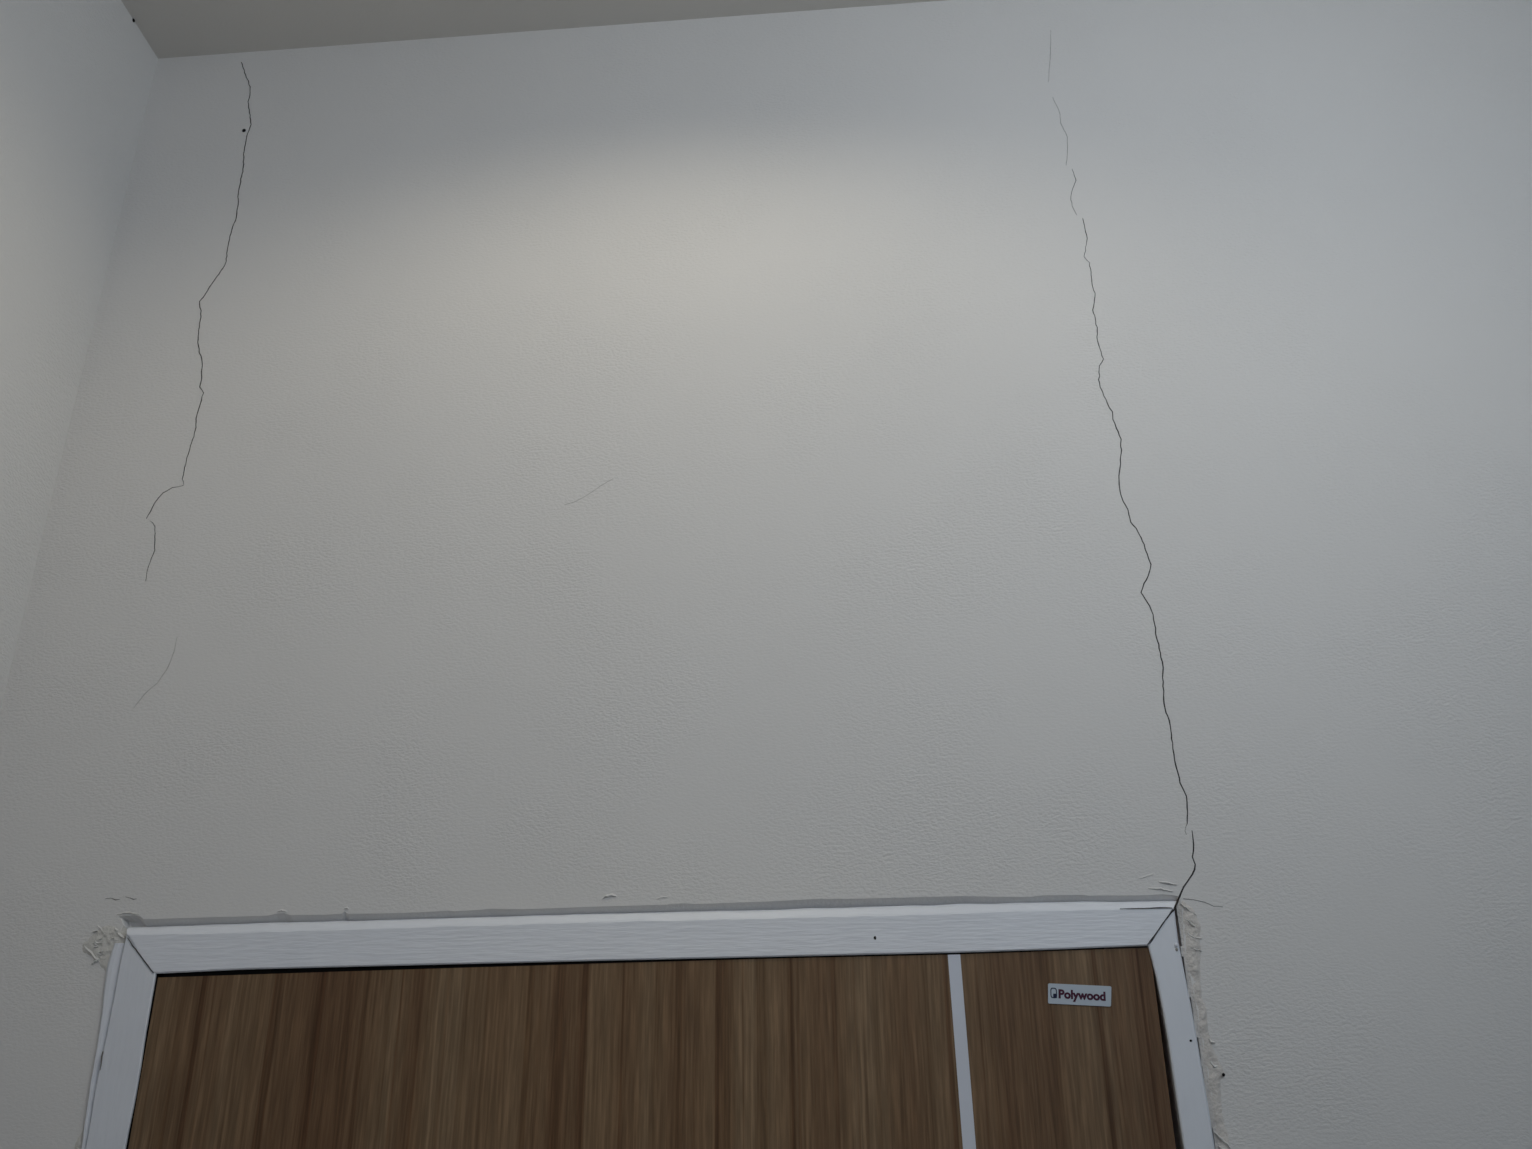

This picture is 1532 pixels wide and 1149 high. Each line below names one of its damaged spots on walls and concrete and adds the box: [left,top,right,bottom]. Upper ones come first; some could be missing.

crack [146,62,251,578]
crack [1048,35,1223,944]
spalling [1138,874,1231,1149]